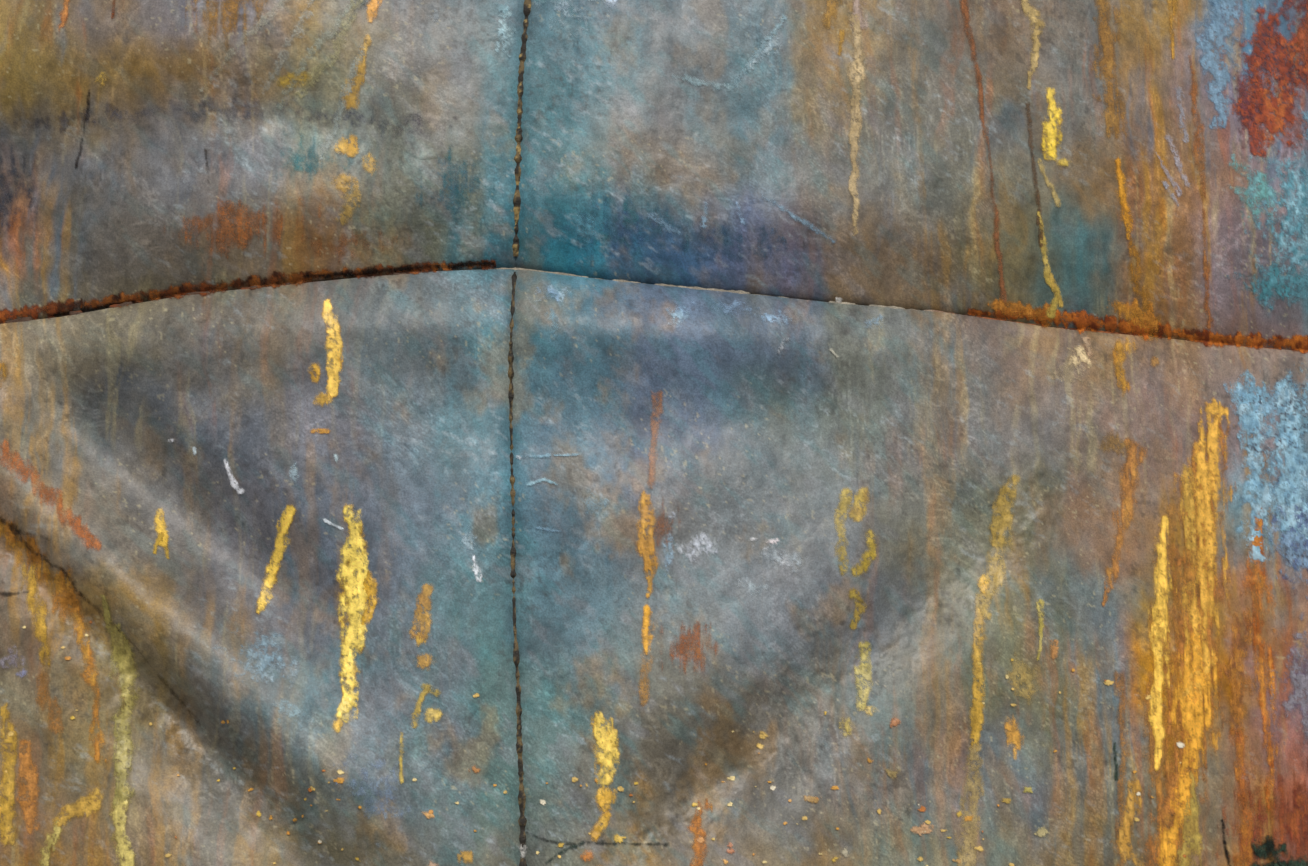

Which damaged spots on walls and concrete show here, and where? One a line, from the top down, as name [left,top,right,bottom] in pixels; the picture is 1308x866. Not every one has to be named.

rust [185,202,283,251]
rust [0,236,496,323]
rust [960,0,1308,391]
rust [0,440,101,550]
rust [1102,434,1145,606]
rust [0,519,106,763]
rust [1144,414,1308,866]
rust [1115,673,1131,866]